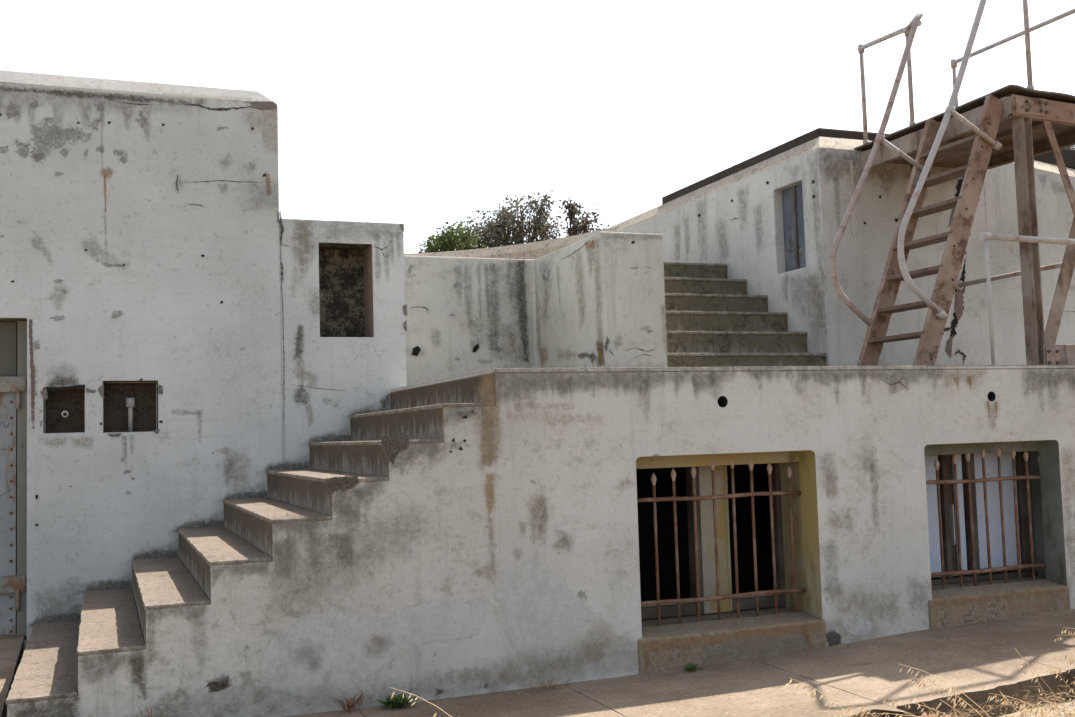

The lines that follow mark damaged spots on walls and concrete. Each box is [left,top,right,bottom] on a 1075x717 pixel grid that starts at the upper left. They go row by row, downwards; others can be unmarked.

peeling [0,102,127,163]
crack [176,171,345,415]
damp [498,261,727,396]
damp [84,653,145,696]
damp [15,695,79,717]